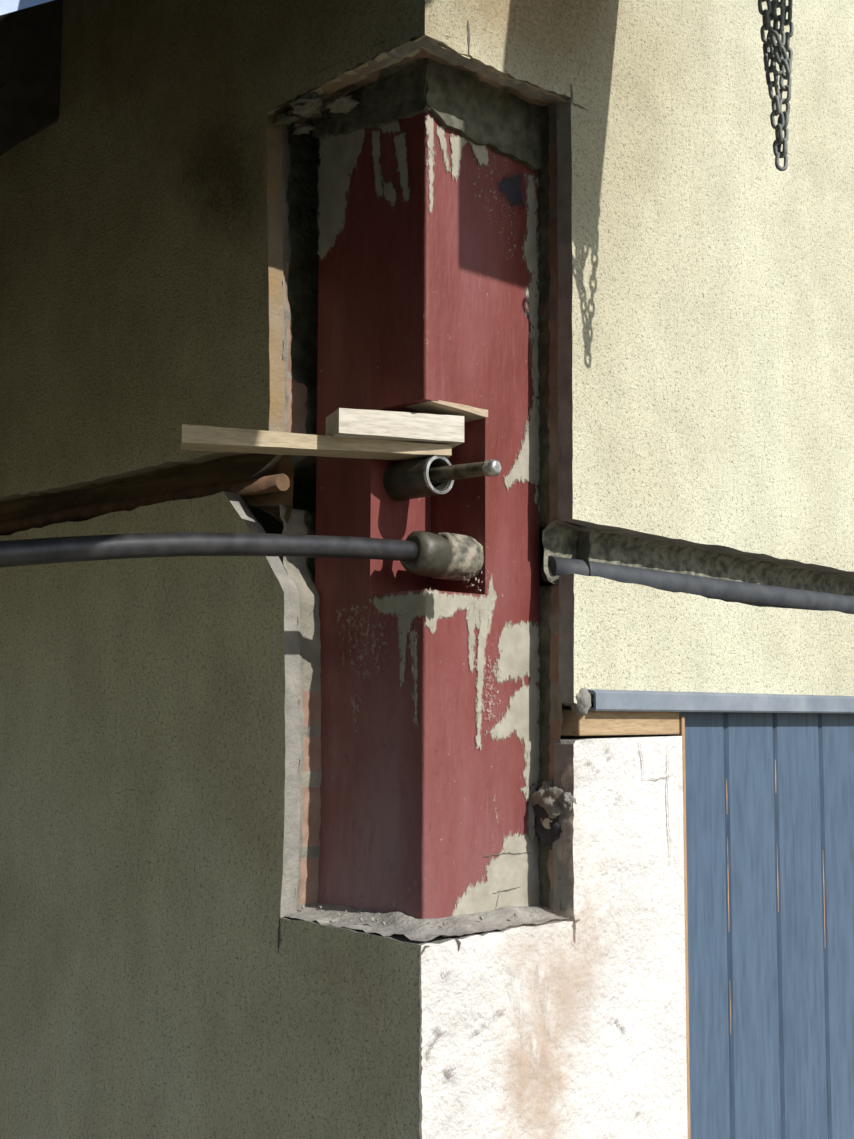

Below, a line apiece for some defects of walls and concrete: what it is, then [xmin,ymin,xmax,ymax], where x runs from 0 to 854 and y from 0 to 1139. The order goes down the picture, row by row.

peeling [274,92,367,260]
peeling [505,173,540,510]
peeling [452,620,577,916]